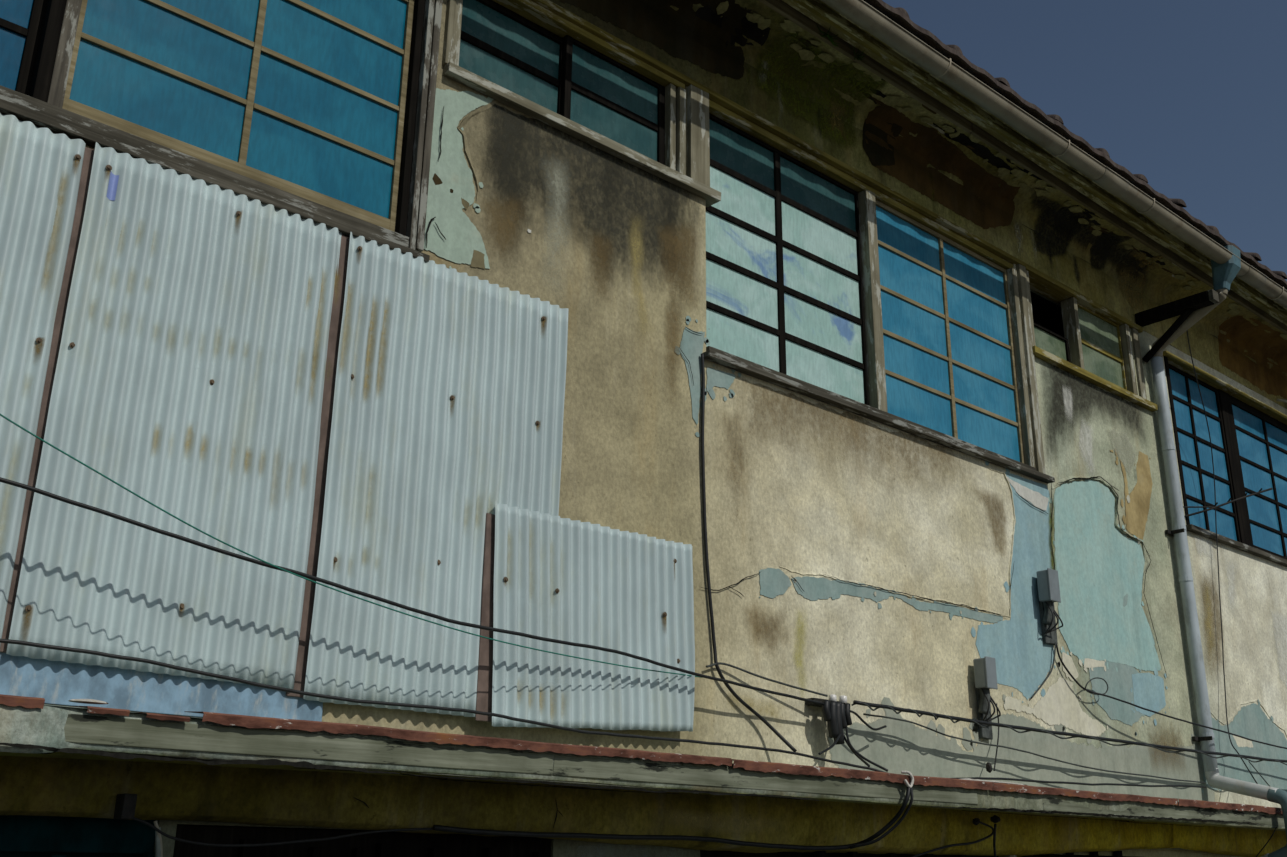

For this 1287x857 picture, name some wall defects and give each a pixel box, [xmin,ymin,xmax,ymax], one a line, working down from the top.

spalling [560,0,835,80]
peeling [416,88,500,269]
leakage [490,103,694,279]
spalling [852,62,1113,236]
leakage [1016,196,1147,281]
spalling [1218,303,1287,399]
corrosion [24,606,32,629]
spalling [759,448,1287,803]